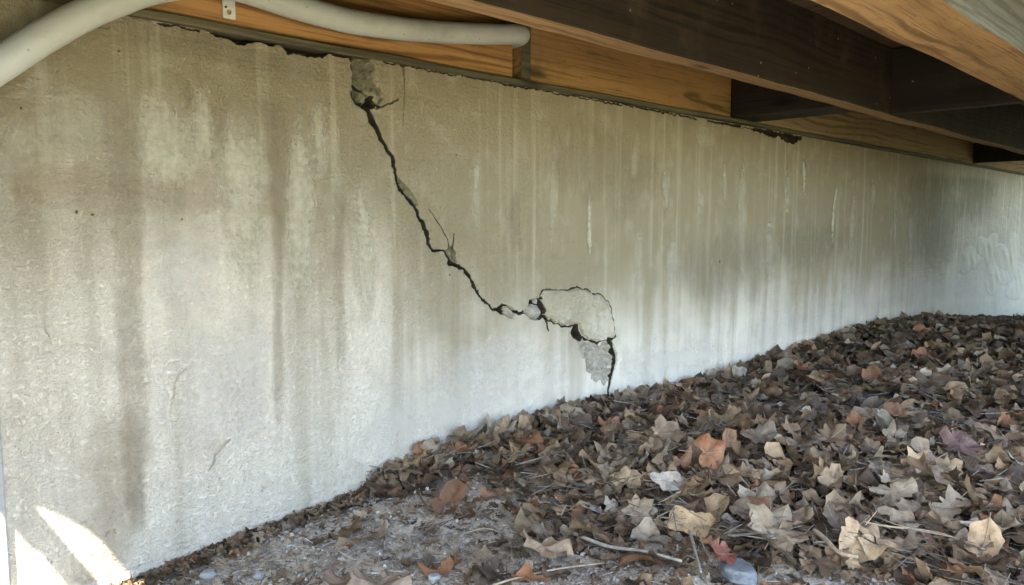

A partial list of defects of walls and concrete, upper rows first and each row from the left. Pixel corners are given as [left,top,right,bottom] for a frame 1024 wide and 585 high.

water stain [135,101,212,183]
water stain [225,135,258,262]
water stain [287,113,322,281]
crack [343,57,525,319]
spalling [151,20,803,147]
spalling [574,338,612,391]
crack [605,337,622,396]